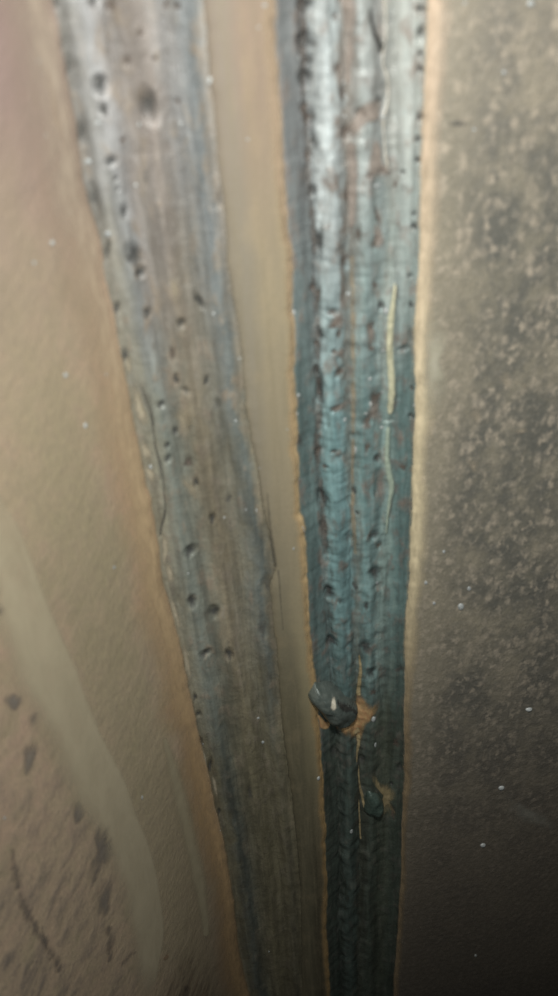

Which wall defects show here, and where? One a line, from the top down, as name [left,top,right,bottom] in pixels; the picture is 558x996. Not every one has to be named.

corrosion [342,655,375,839]
corrosion [376,780,392,807]